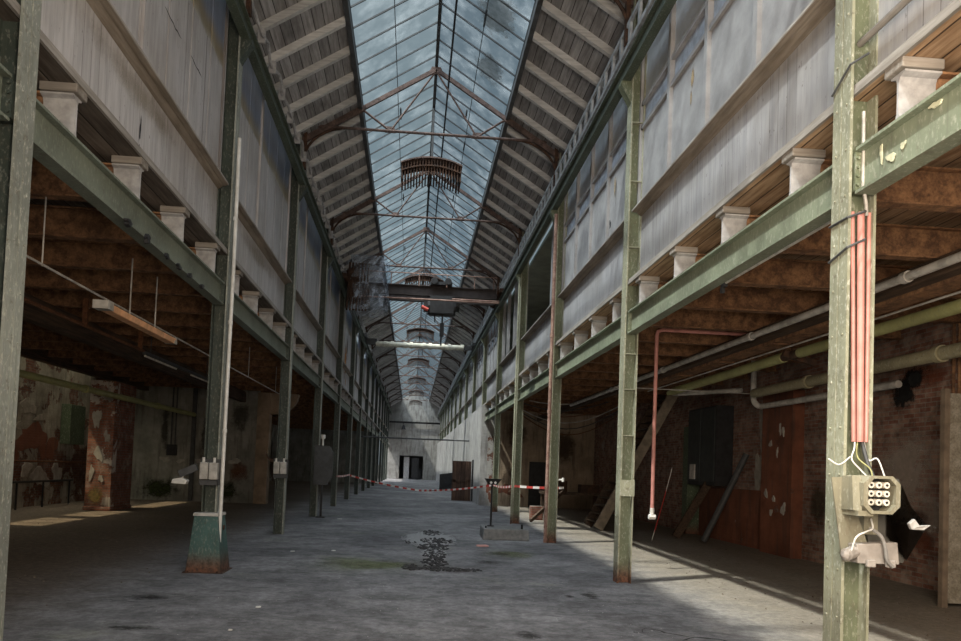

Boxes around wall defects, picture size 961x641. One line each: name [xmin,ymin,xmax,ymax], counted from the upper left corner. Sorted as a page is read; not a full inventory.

flaking render [14,421,62,487]
peeling [89,389,113,483]